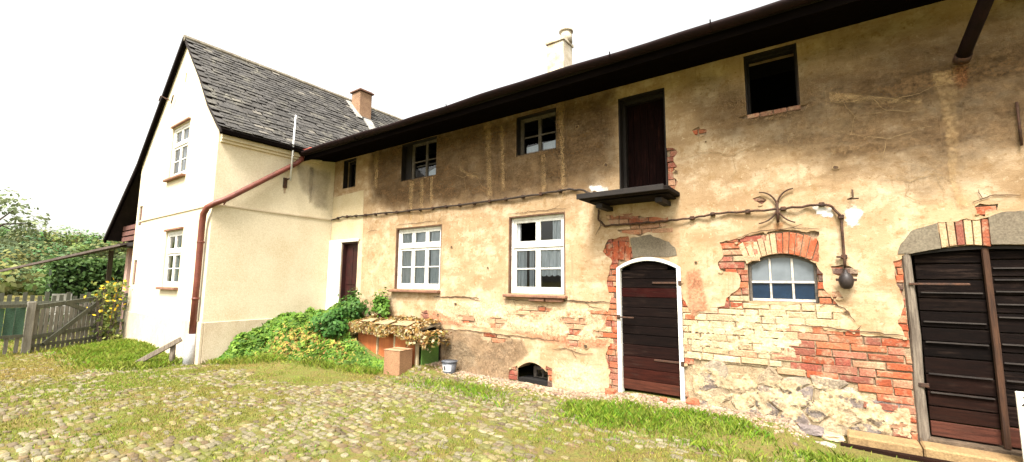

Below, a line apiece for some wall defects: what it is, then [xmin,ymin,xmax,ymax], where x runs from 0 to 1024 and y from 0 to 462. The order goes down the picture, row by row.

leakage [371,92,616,207]
peeling [667,148,678,189]
crack [817,87,1018,202]
peeling [938,204,998,248]
peeling [420,213,673,392]
peeling [681,230,918,441]